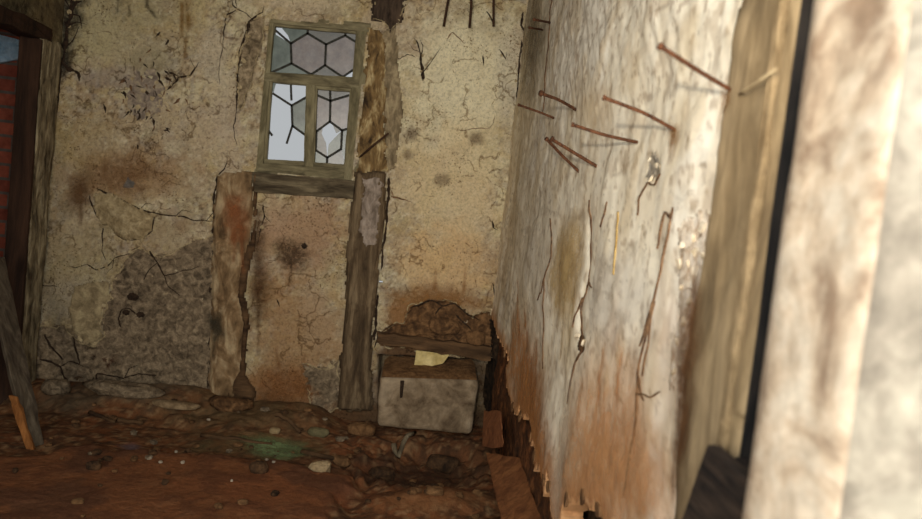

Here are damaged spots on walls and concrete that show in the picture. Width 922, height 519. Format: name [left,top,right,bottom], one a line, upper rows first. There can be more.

crack [40,334,157,380]
spalling [36,233,214,389]
crack [67,0,264,296]
crack [257,205,271,244]
spalling [382,299,552,519]
crack [566,174,661,404]
crack [623,207,701,496]